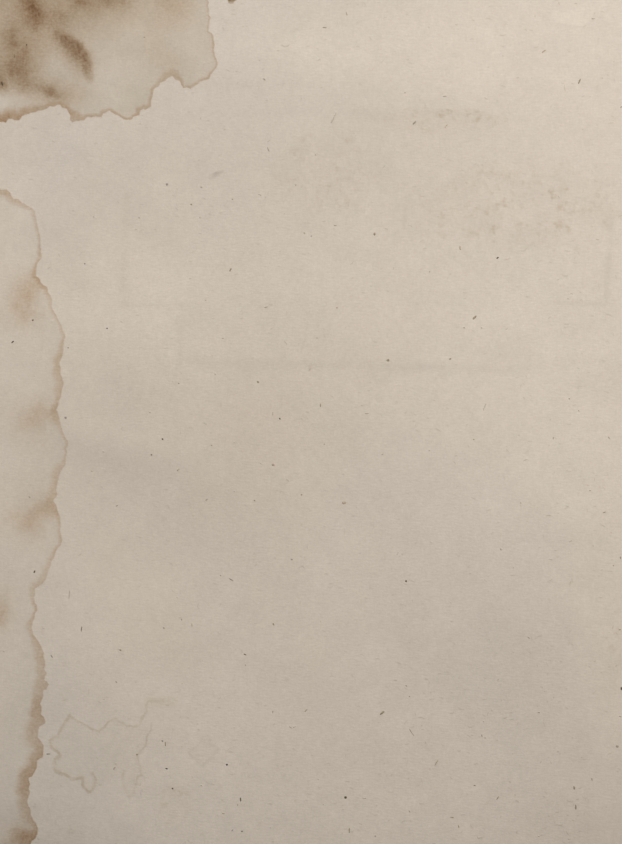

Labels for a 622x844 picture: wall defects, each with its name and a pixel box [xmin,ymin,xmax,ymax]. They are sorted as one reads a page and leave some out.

water stain [0,0,218,123]
water stain [0,188,179,844]